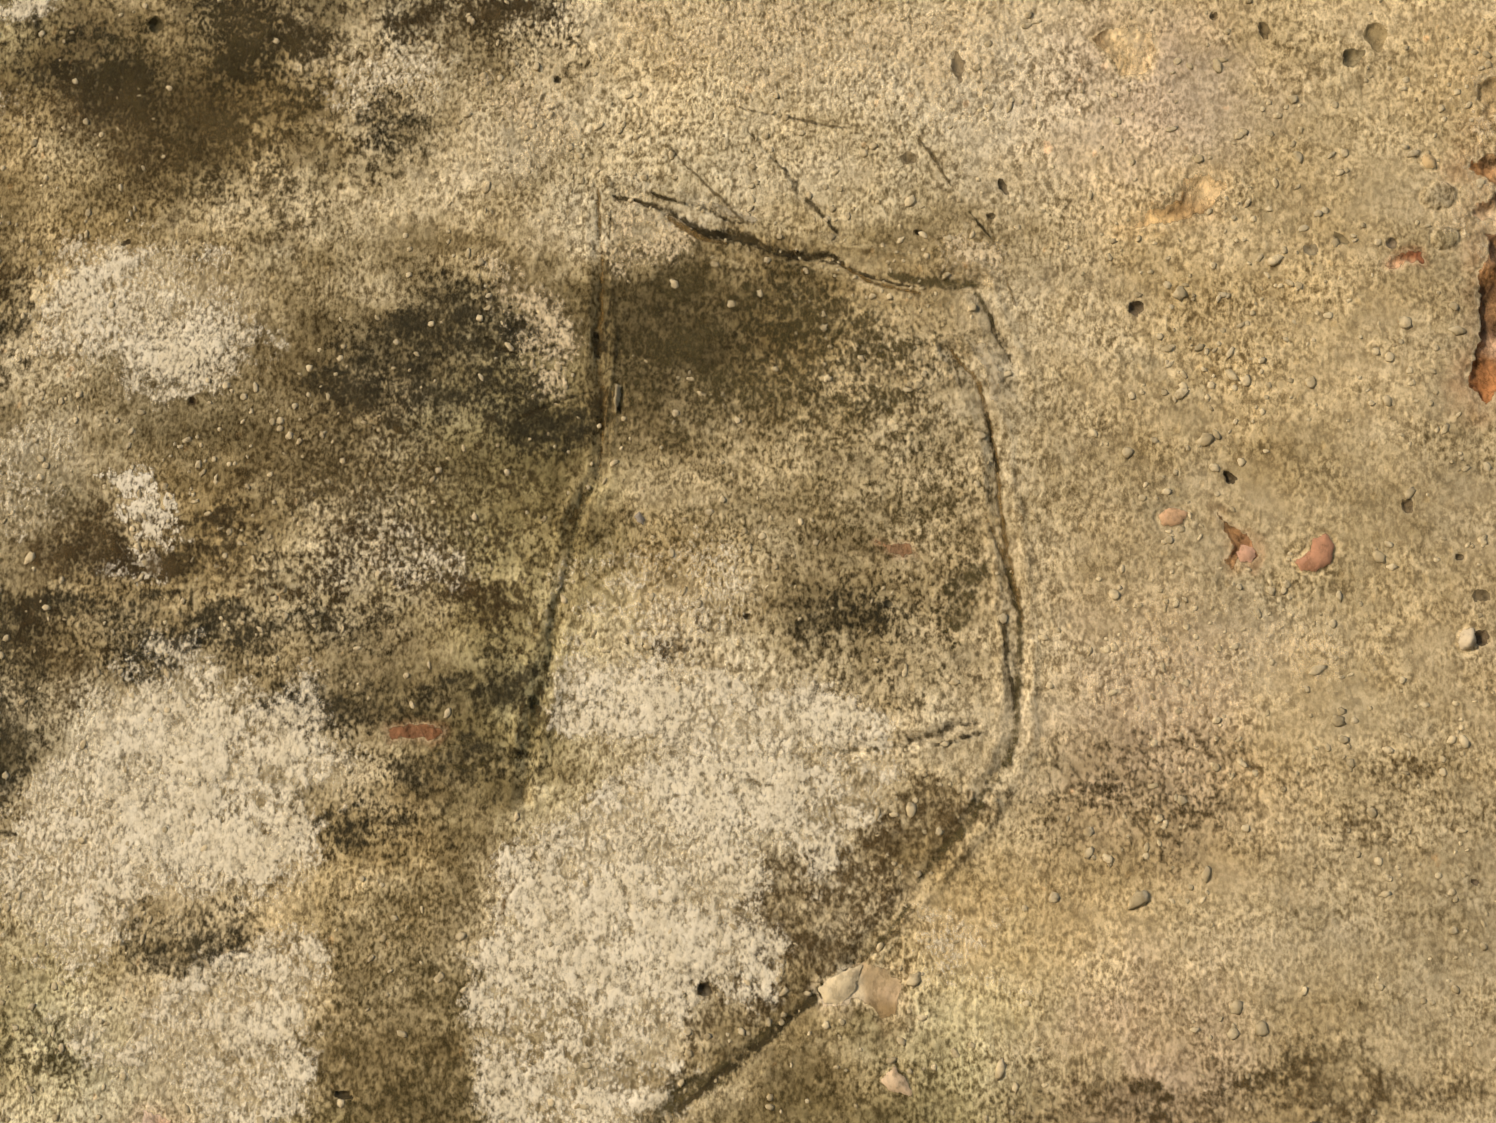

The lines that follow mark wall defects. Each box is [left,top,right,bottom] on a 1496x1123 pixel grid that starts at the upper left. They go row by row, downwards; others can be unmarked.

leakage [0,0,573,196]
leakage [619,0,1018,113]
crack [485,337,517,354]
leakage [604,182,957,444]
spalling [1436,76,1496,404]
crack [434,656,552,784]
leakage [0,228,1008,1123]
crack [518,188,1023,1123]